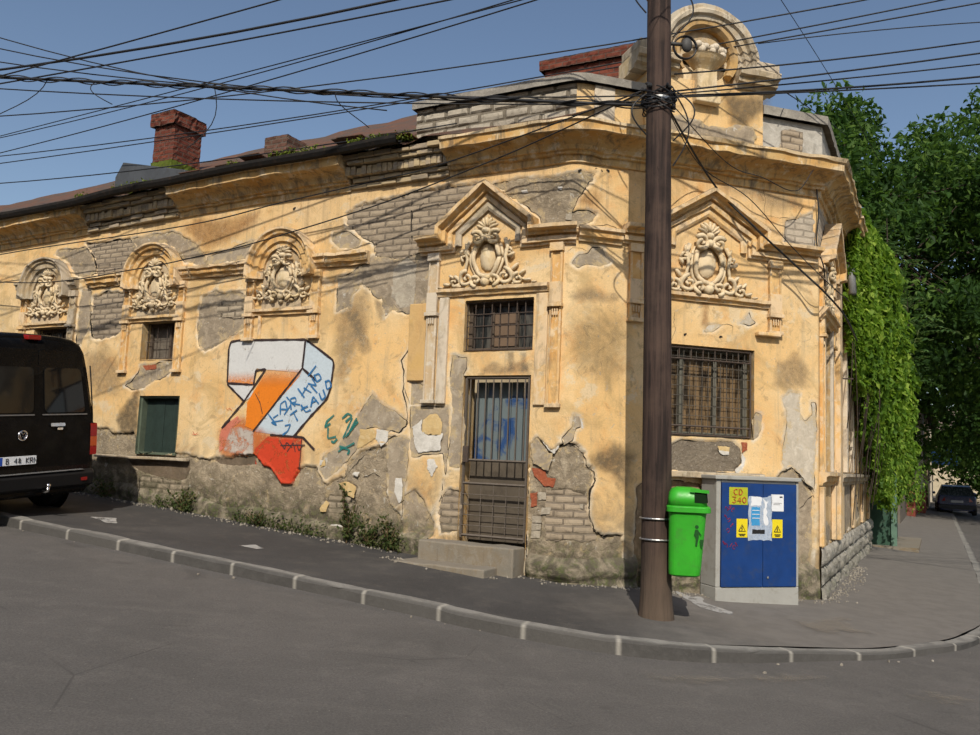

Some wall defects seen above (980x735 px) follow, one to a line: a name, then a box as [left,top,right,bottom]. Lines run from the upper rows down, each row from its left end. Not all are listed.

peeling [336,253,429,316]
peeling [493,171,597,227]
peeling [572,247,611,268]
peeling [784,207,828,247]
peeling [197,291,245,351]
spalling [92,355,467,547]
spalling [526,415,642,587]
peeling [672,412,762,490]
peeling [777,392,817,565]